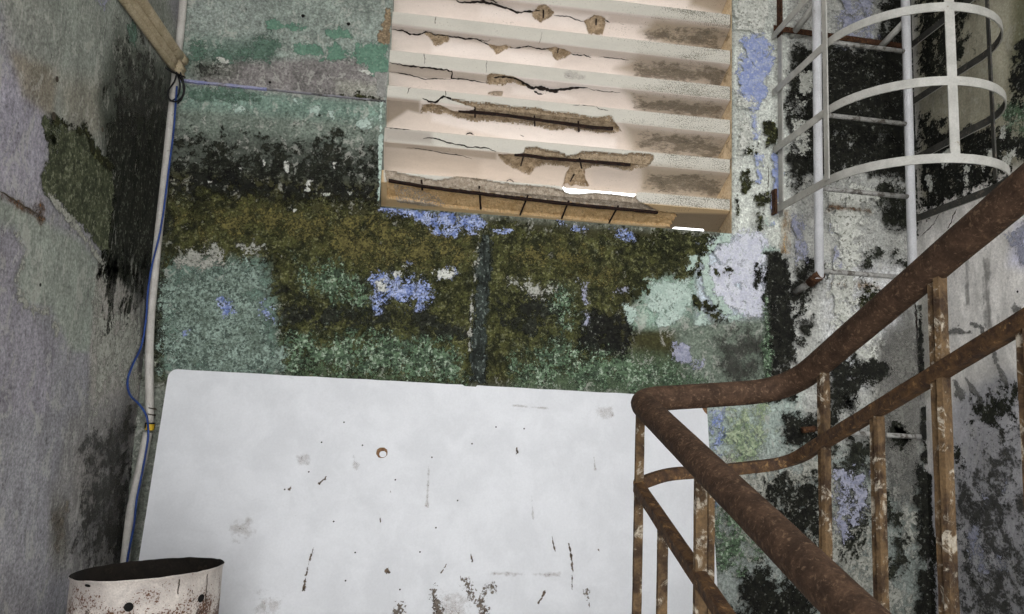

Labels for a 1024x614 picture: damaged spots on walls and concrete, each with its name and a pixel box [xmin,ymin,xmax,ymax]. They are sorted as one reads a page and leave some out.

peeling [289,98,336,120]
crack [390,0,620,111]
spalling [421,73,619,134]
spalling [532,4,554,23]
spalling [584,15,606,35]
water stain [783,0,1024,239]
water stain [51,35,383,378]
spalling [356,102,676,351]
water stain [765,352,892,454]
water stain [757,469,819,546]
water stain [887,405,938,614]
water stain [954,380,1024,614]